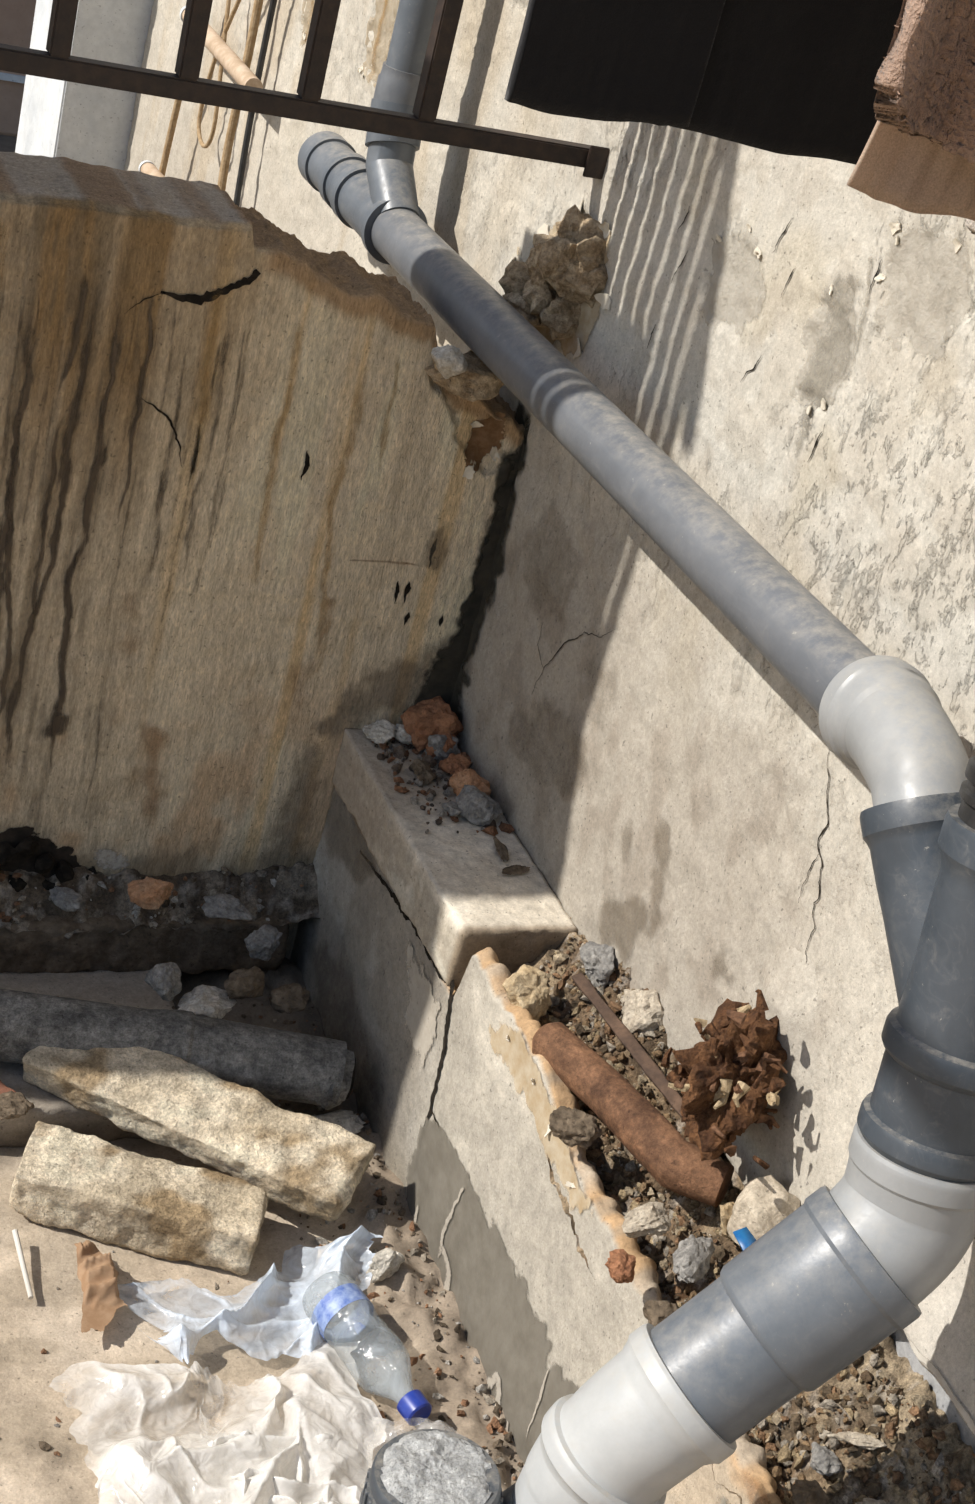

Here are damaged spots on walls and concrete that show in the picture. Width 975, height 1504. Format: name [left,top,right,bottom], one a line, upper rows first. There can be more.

crack [127,269,261,312]
spalling [425,344,506,479]
damp [0,280,153,763]
damp [328,401,530,733]
crack [798,753,829,962]
crack [360,850,455,1126]
damp [404,941,440,1067]